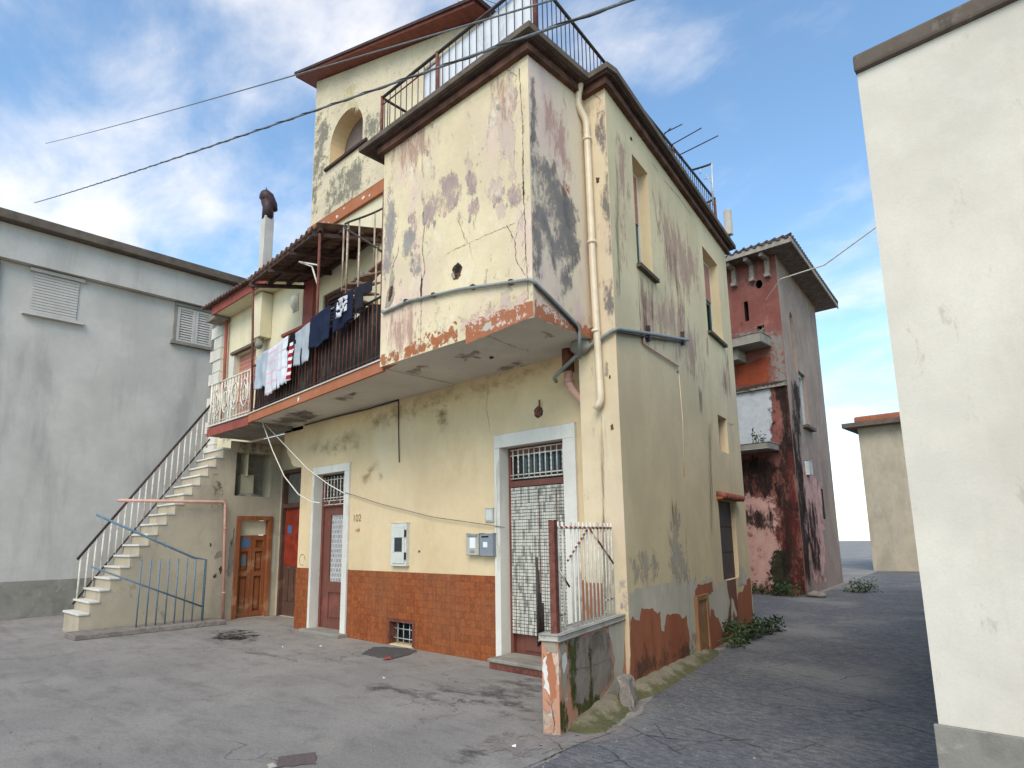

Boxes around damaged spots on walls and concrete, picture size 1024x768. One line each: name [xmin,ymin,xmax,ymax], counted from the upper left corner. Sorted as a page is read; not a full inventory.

damp [312,113,363,215]
damp [382,186,396,280]
crack [420,69,528,347]
peeling [380,289,591,374]
damp [531,78,580,291]
crack [736,381,783,392]
damp [741,381,823,594]
flaking render [542,493,794,714]